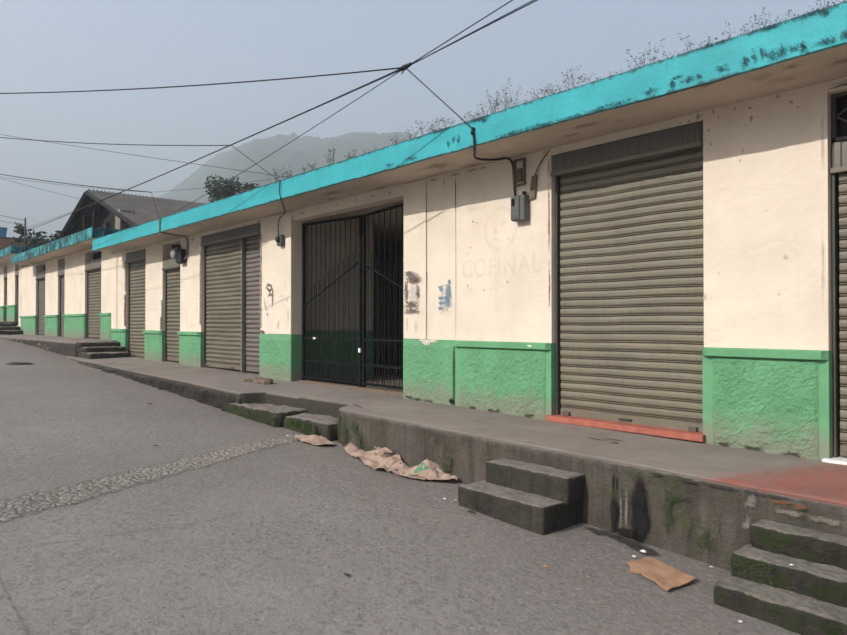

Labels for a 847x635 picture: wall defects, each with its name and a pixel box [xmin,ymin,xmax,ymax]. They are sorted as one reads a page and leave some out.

water stain [752,4,838,32]
mould [741,41,806,70]
water stain [587,479,659,555]